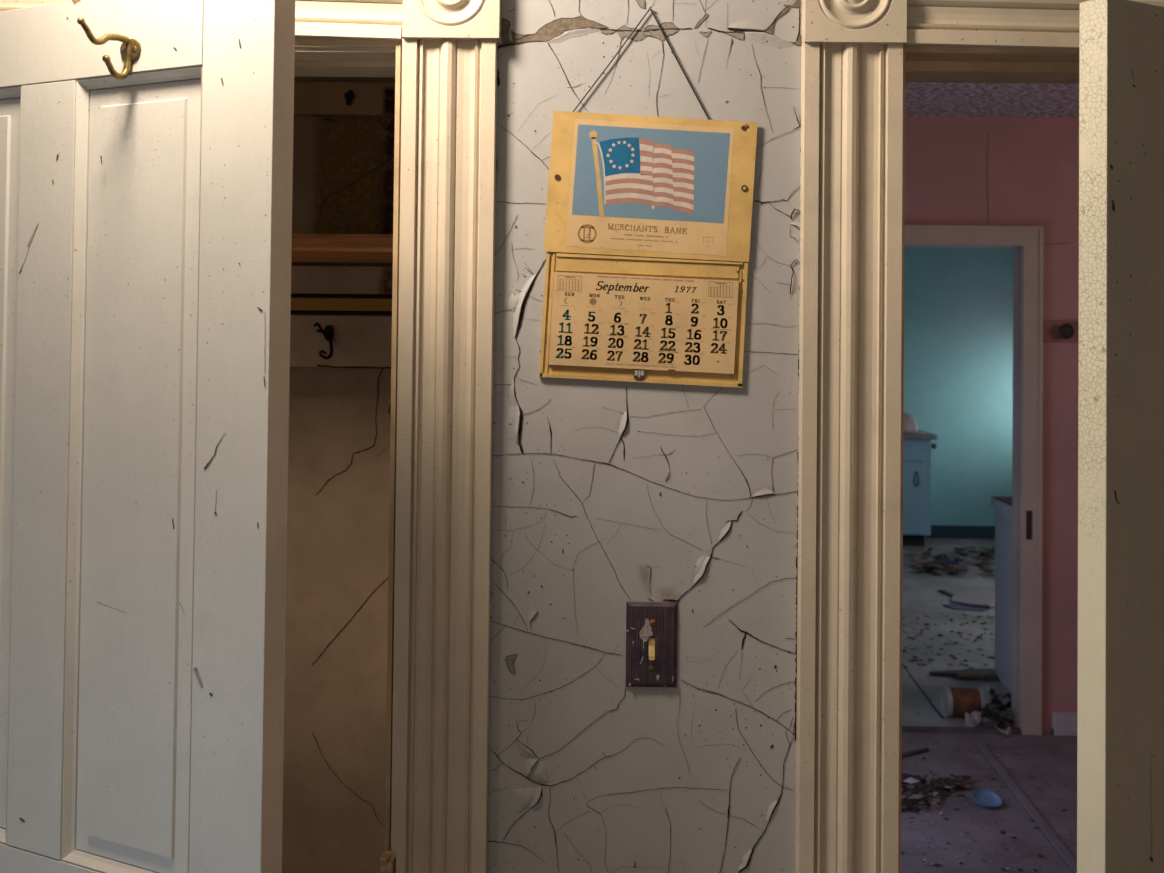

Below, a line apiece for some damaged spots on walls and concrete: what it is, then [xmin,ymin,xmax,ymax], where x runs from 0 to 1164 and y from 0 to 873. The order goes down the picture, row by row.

spalling [497,15,679,87]
spalling [694,13,745,40]
spalling [764,0,801,35]
crack [497,0,801,422]
crack [316,369,390,495]
crack [488,202,798,873]
crack [312,578,388,665]